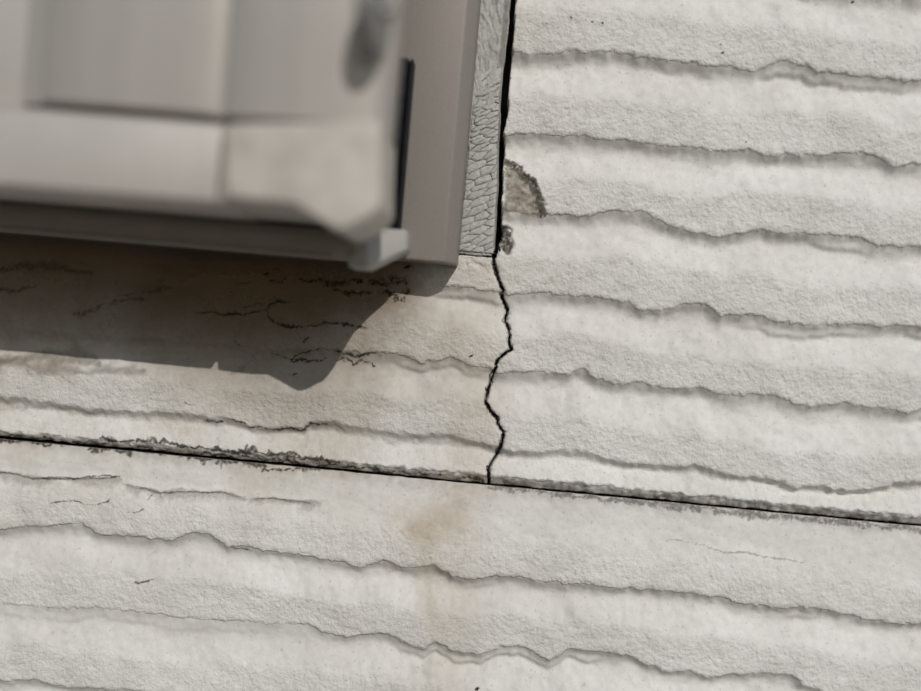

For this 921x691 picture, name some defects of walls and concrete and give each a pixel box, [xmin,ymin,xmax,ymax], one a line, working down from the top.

peeling [459,66,547,255]
crack [201,282,375,375]
crack [460,243,513,483]